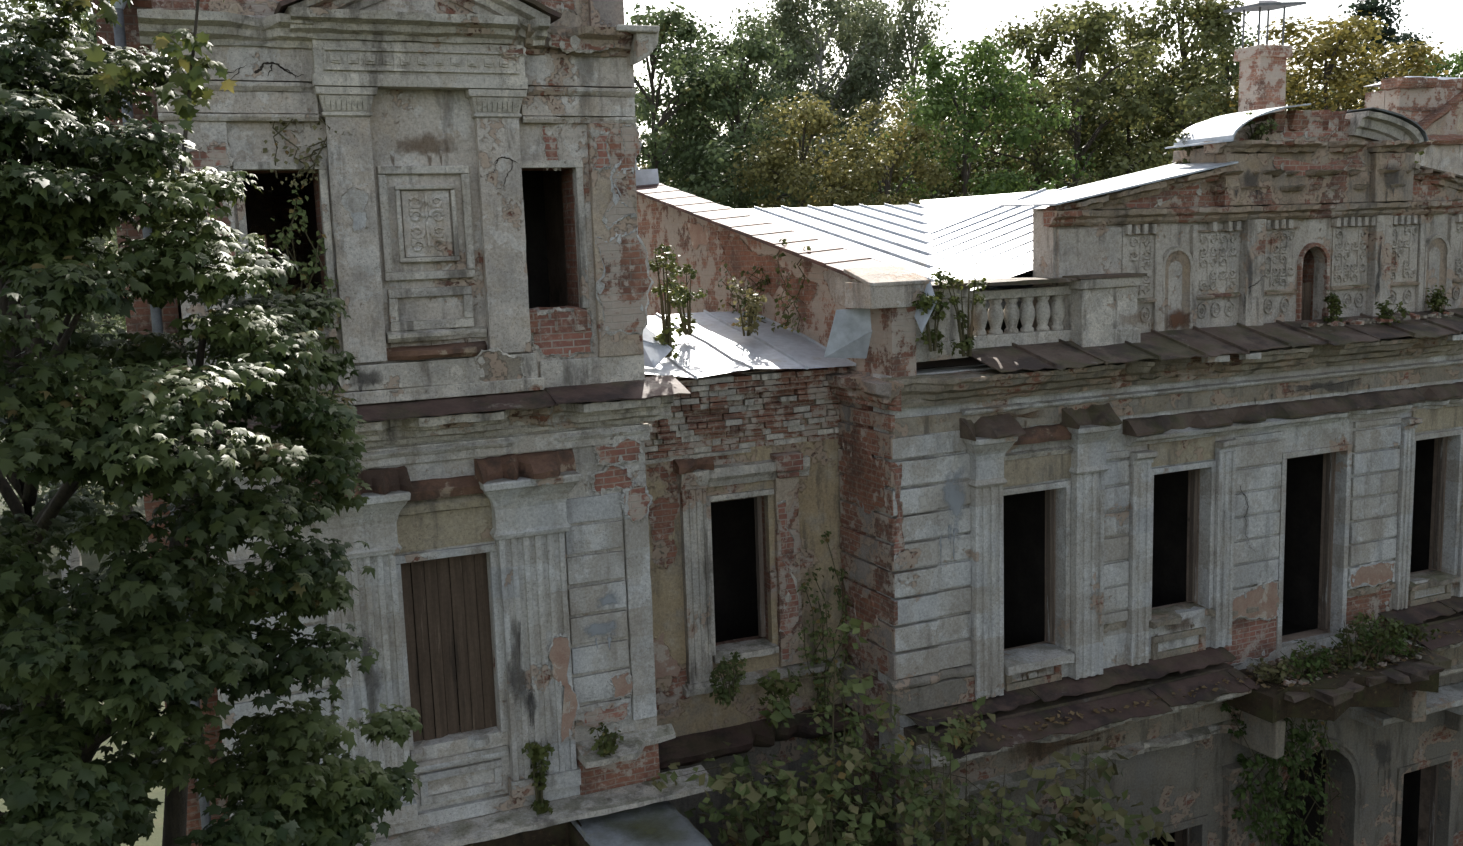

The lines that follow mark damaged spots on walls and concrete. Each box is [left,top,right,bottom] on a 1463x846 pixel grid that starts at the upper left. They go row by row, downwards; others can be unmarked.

flaking render [536,0,577,15]
flaking render [547,32,615,54]
flaking render [540,123,561,171]
flaking render [474,227,654,382]
flaking render [590,436,680,572]
flaking render [891,462,905,557]
flaking render [1223,580,1280,666]
flaking render [1339,561,1396,640]
flaking render [547,633,633,744]